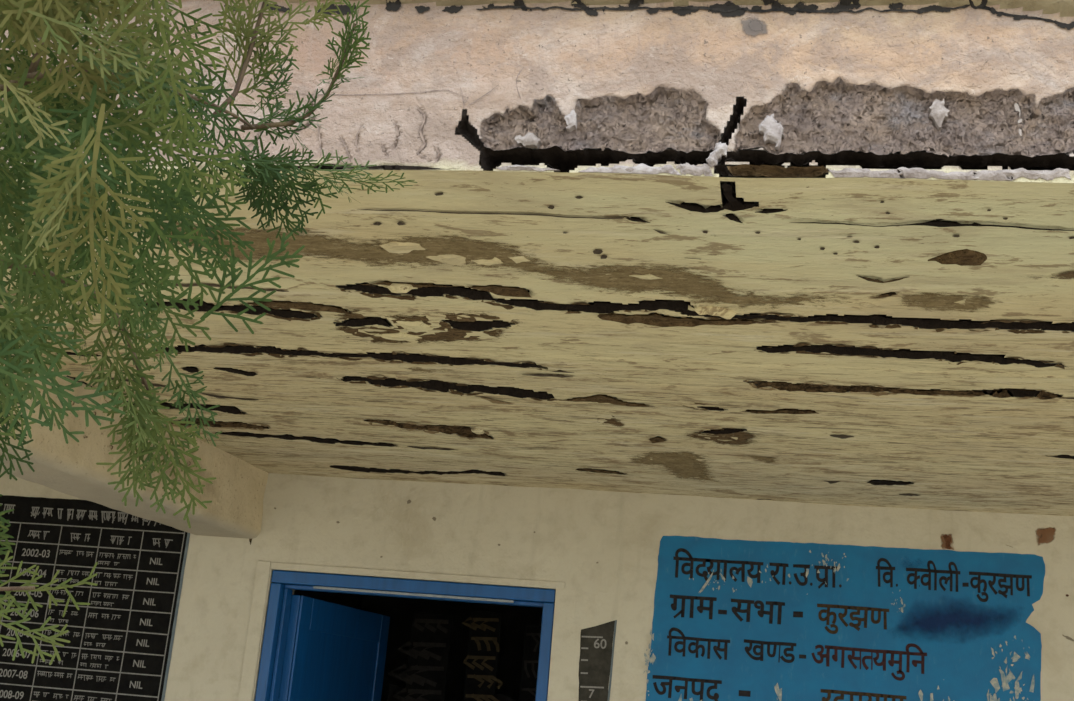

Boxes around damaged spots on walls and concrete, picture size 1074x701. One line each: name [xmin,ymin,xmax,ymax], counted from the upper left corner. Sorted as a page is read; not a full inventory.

spalling [480,87,720,176]
crack [270,67,1074,235]
spalling [727,77,1074,181]
peeling [150,222,852,311]
peeling [928,249,987,266]
peeling [1032,271,1074,280]
spalling [334,309,519,345]
peeling [901,292,1003,314]
spalling [678,401,724,412]
peeling [629,428,776,481]
peeling [689,564,771,593]
peeling [987,635,1035,701]